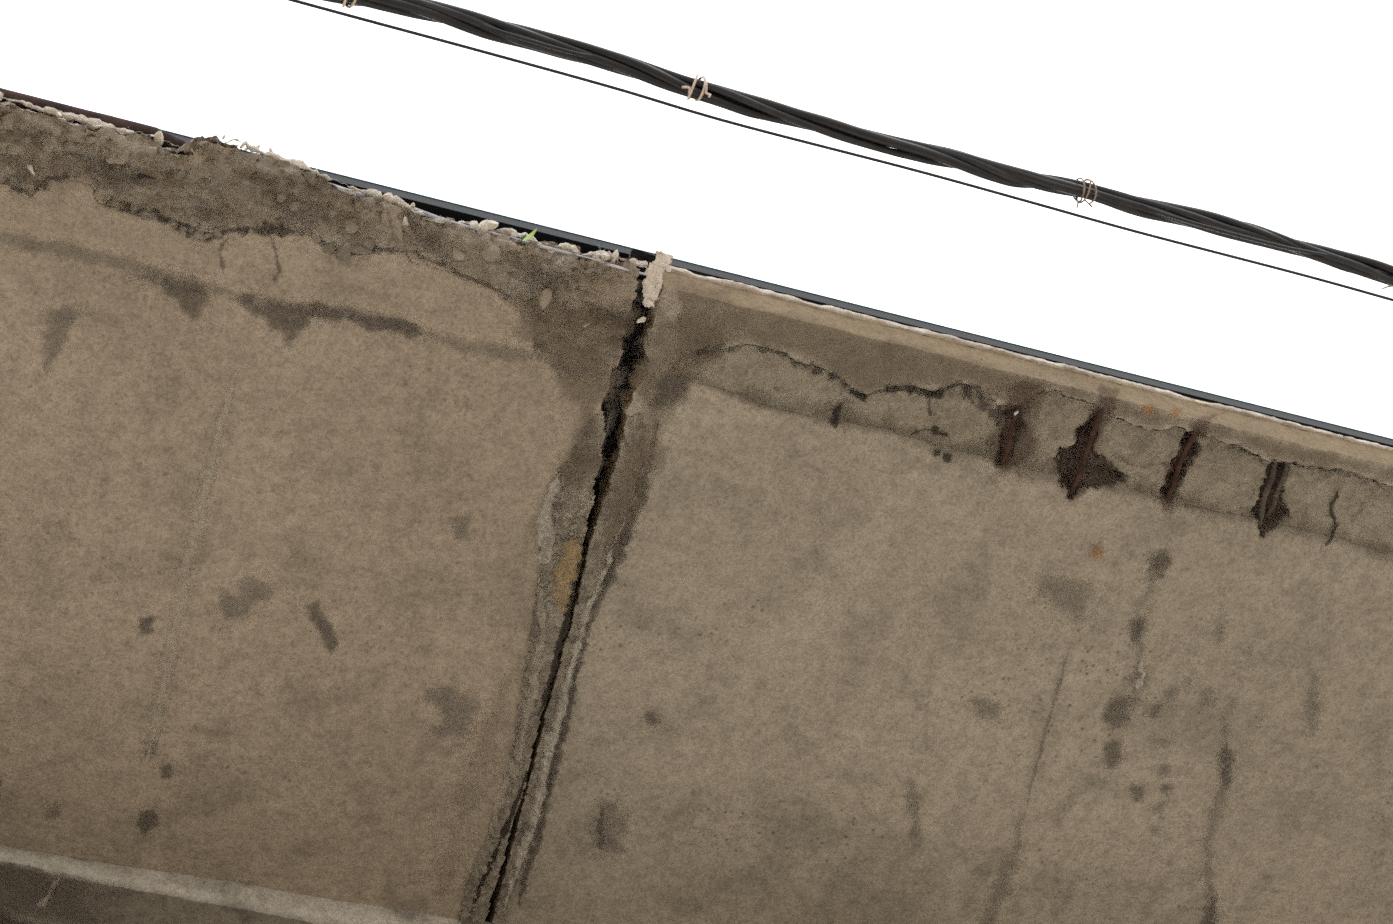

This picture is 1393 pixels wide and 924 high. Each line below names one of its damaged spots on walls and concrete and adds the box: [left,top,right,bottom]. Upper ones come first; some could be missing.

spalling [0,92,648,368]
damp [242,295,418,339]
damp [528,250,1041,415]
damp [830,405,842,428]
crack [729,346,1028,463]
corrosion [1064,387,1118,499]
corrosion [1162,417,1212,510]
crack [1227,446,1267,466]
crack [1302,467,1387,546]
crack [471,250,656,918]
damp [1104,608,1146,768]